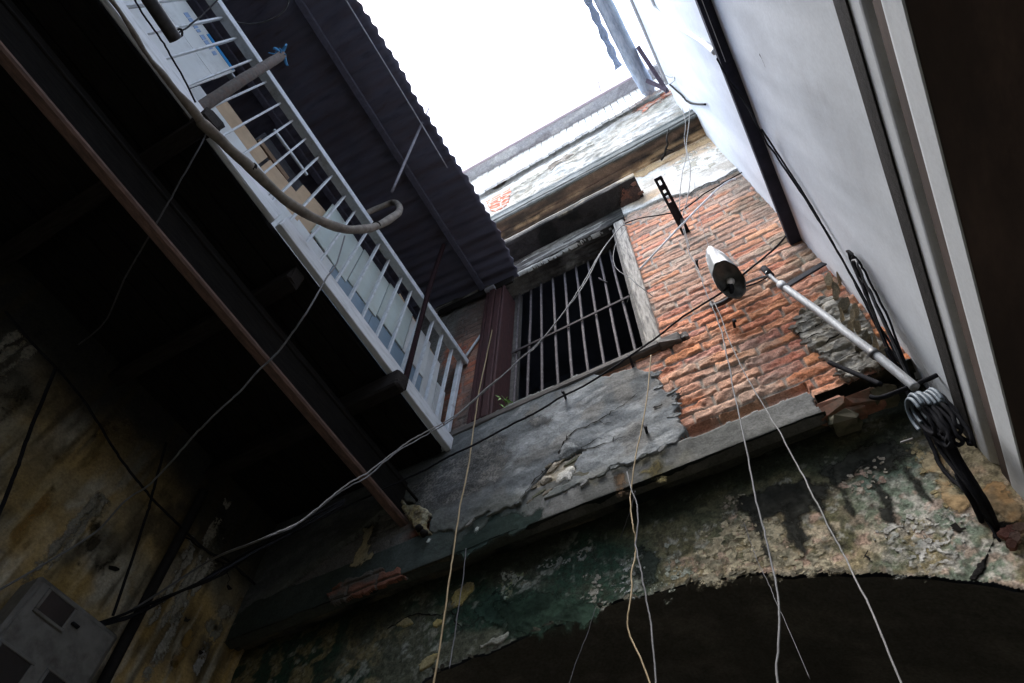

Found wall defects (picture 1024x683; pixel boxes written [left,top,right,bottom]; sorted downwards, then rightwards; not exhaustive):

flaking render [788,271,888,383]
damp [0,329,38,421]
damp [142,498,231,682]
flaking render [327,567,408,607]
flaking render [401,500,432,538]
peeling [496,546,597,600]
flaking render [514,453,621,506]
peeling [580,494,845,611]
damp [737,439,933,562]
peeling [830,436,973,577]
spalling [969,520,1024,582]
peeling [468,632,509,659]